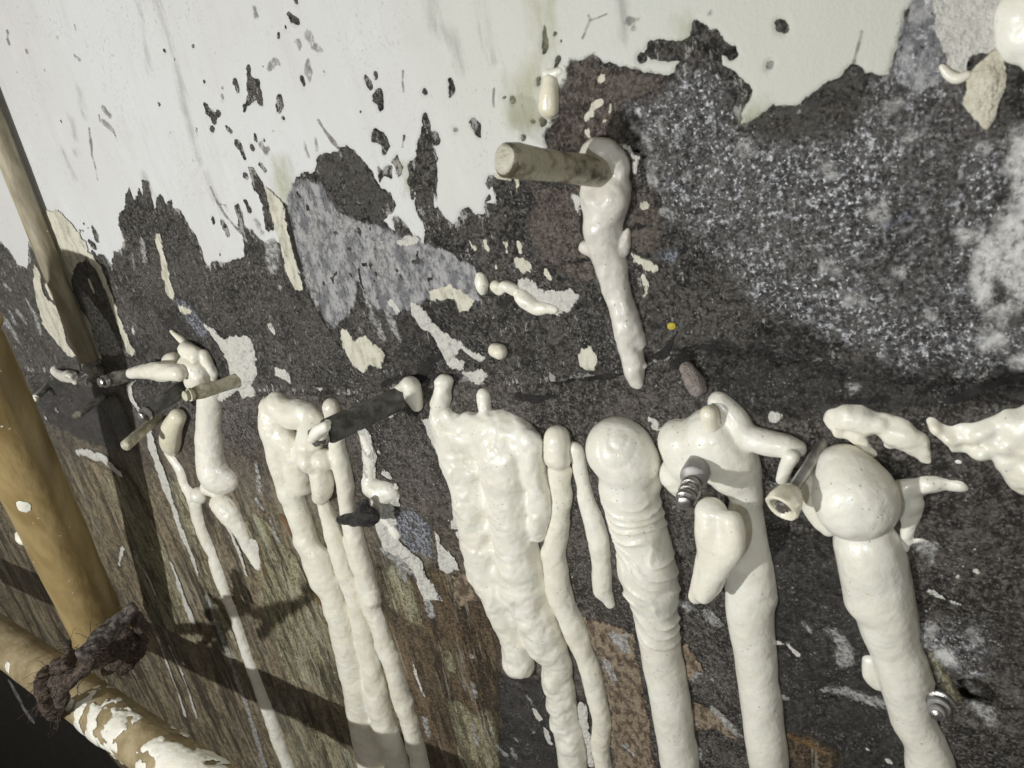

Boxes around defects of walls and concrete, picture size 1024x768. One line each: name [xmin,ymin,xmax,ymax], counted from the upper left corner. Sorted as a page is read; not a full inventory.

peeling [277,0,300,39]
peeling [0,241,87,379]
peeling [70,64,623,395]
peeling [531,4,1024,381]